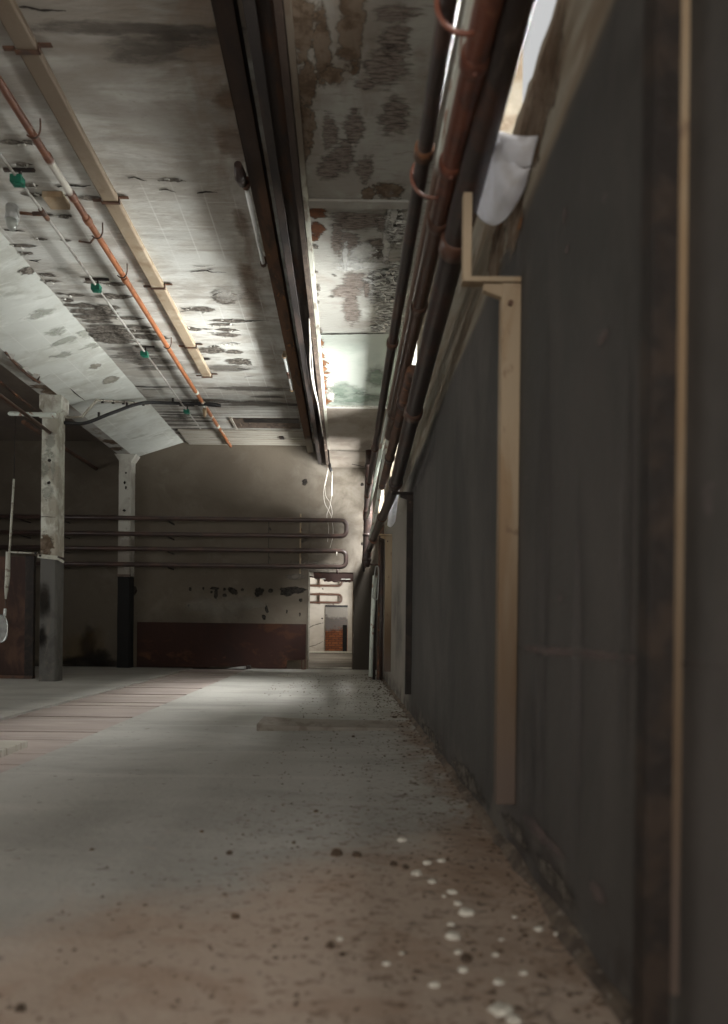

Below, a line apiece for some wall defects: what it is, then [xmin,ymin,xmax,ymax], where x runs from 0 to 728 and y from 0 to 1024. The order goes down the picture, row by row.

peeling [361,183,406,333]
water stain [111,346,172,370]
spalling [189,586,307,620]